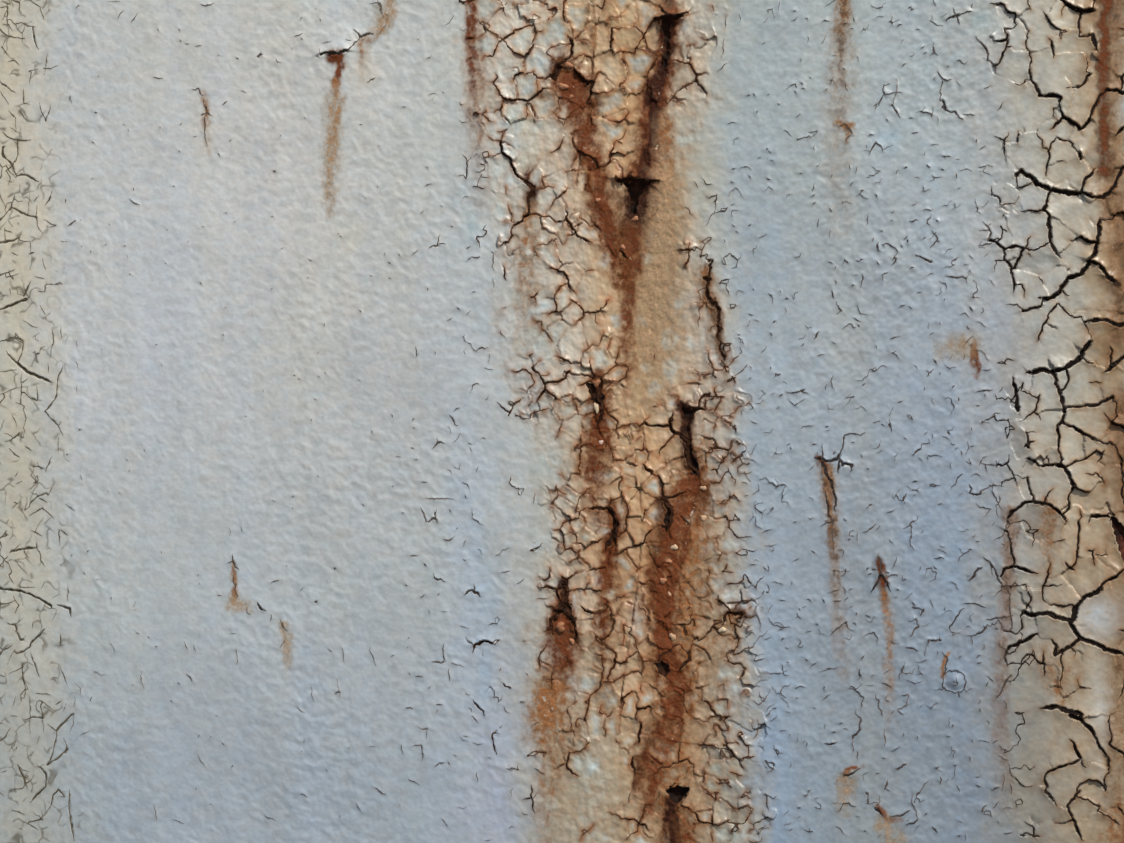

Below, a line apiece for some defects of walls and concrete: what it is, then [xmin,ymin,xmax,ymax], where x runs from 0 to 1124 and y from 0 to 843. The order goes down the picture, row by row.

corrosion [326,49,345,198]
corrosion [465,0,484,115]
corrosion [519,173,539,286]
corrosion [550,0,684,387]
corrosion [833,0,850,85]
corrosion [1095,0,1124,323]
crack [0,0,135,841]
corrosion [528,579,582,796]
corrosion [579,368,623,663]
corrosion [632,400,747,843]
corrosion [816,455,840,597]
corrosion [876,557,893,657]